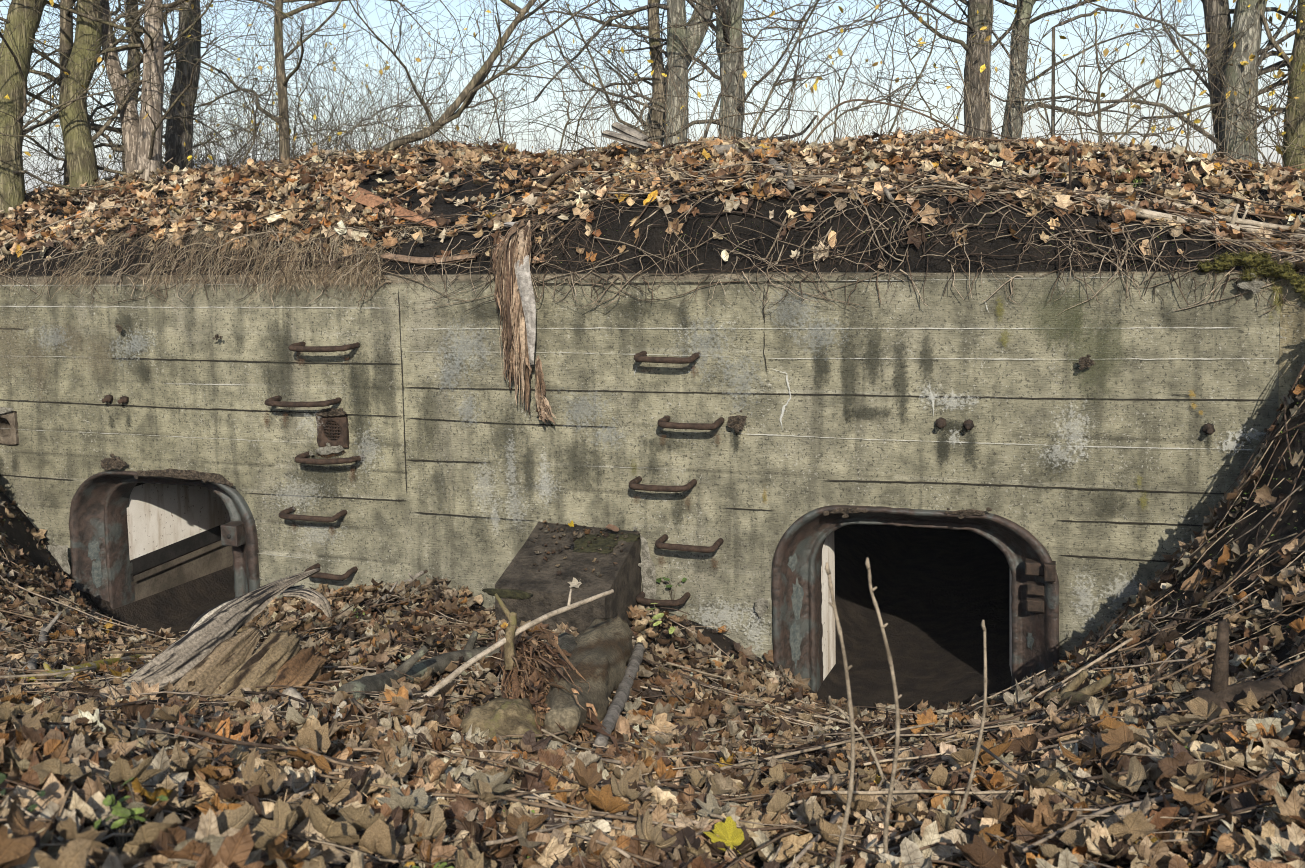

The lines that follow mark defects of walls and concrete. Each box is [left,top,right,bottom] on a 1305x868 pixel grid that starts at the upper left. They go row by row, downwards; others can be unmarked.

damp [731,299,1061,467]
damp [1118,420,1248,457]